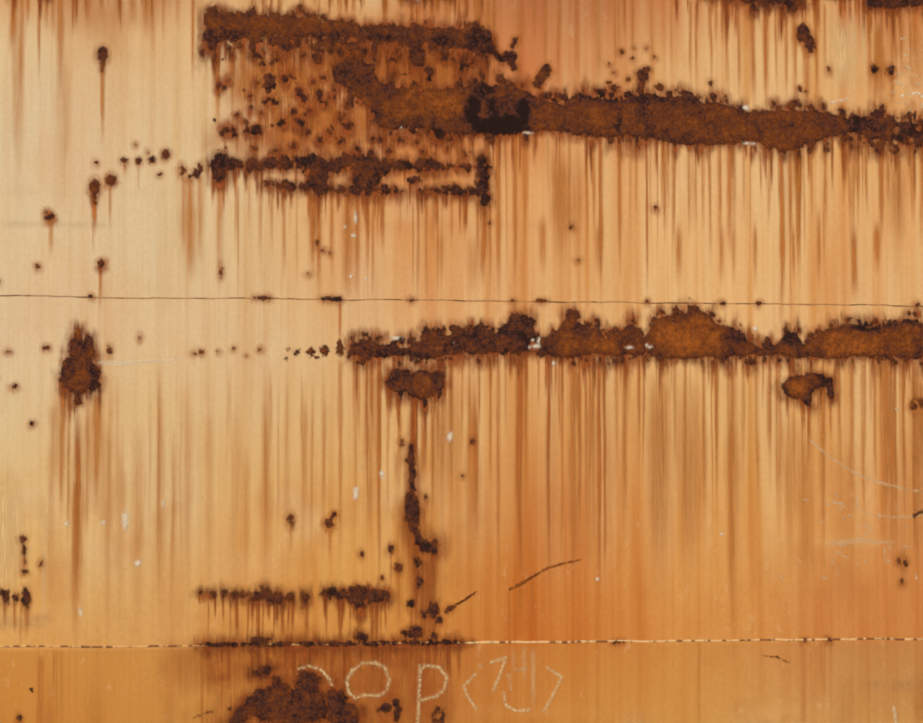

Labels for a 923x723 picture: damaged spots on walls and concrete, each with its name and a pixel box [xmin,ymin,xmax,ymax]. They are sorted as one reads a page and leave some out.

rust [11,0,89,69]
rust [120,149,170,165]
rust [179,0,923,284]
rust [89,175,117,222]
rust [59,324,113,551]
rust [193,296,923,723]
rust [0,587,31,622]